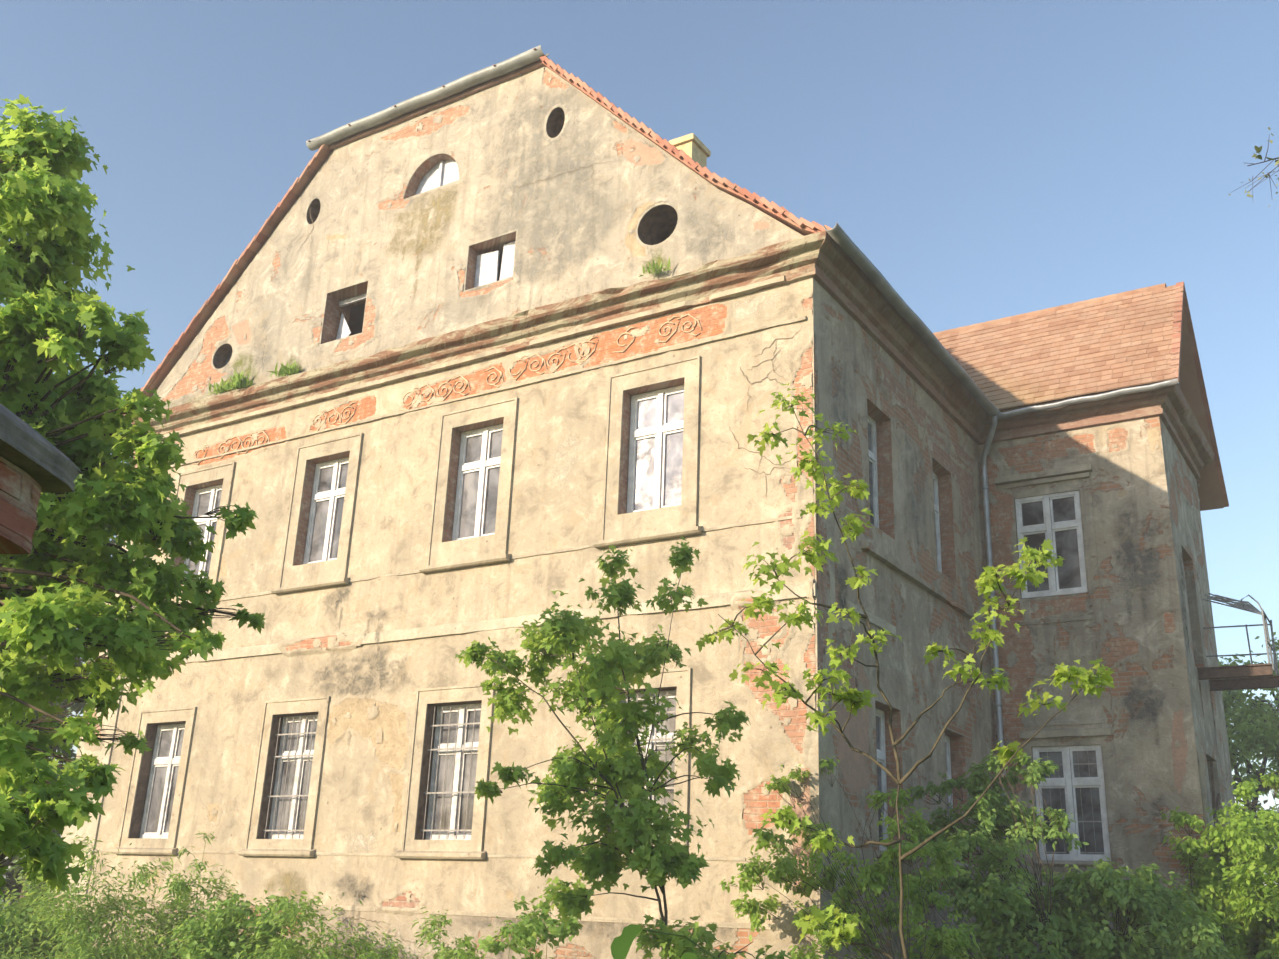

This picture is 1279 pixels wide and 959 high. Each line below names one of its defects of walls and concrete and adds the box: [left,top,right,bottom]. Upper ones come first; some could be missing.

spalling [795,292,813,317]
spalling [150,309,255,411]
spalling [277,630,363,658]
spalling [730,337,872,911]
spalling [950,421,1162,798]
spalling [374,882,429,916]